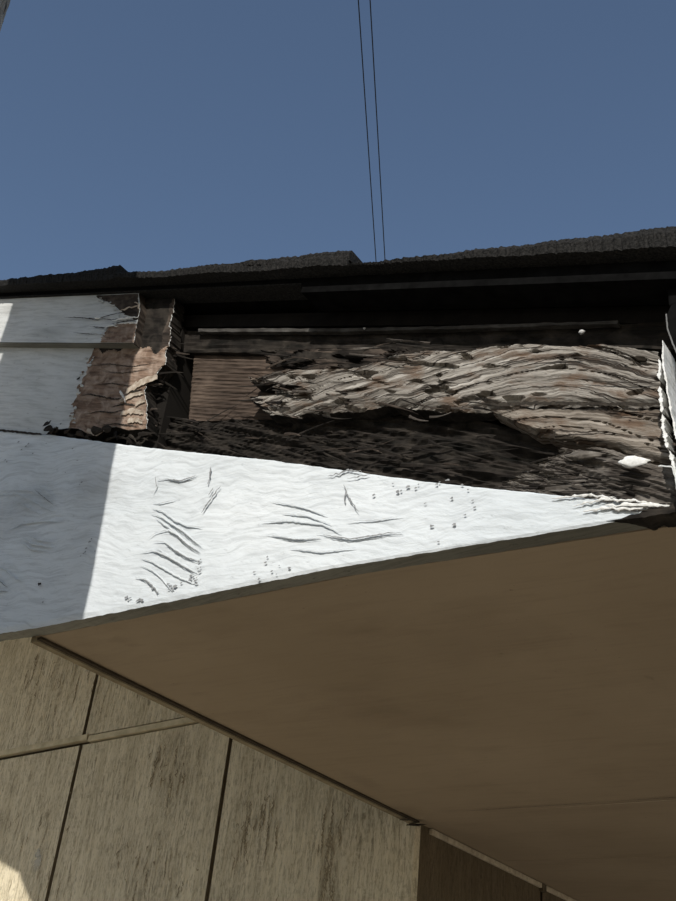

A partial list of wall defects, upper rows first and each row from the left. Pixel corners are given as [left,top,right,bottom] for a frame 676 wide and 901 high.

peeling [68,294,174,436]
peeling [656,340,676,483]
peeling [552,493,670,512]